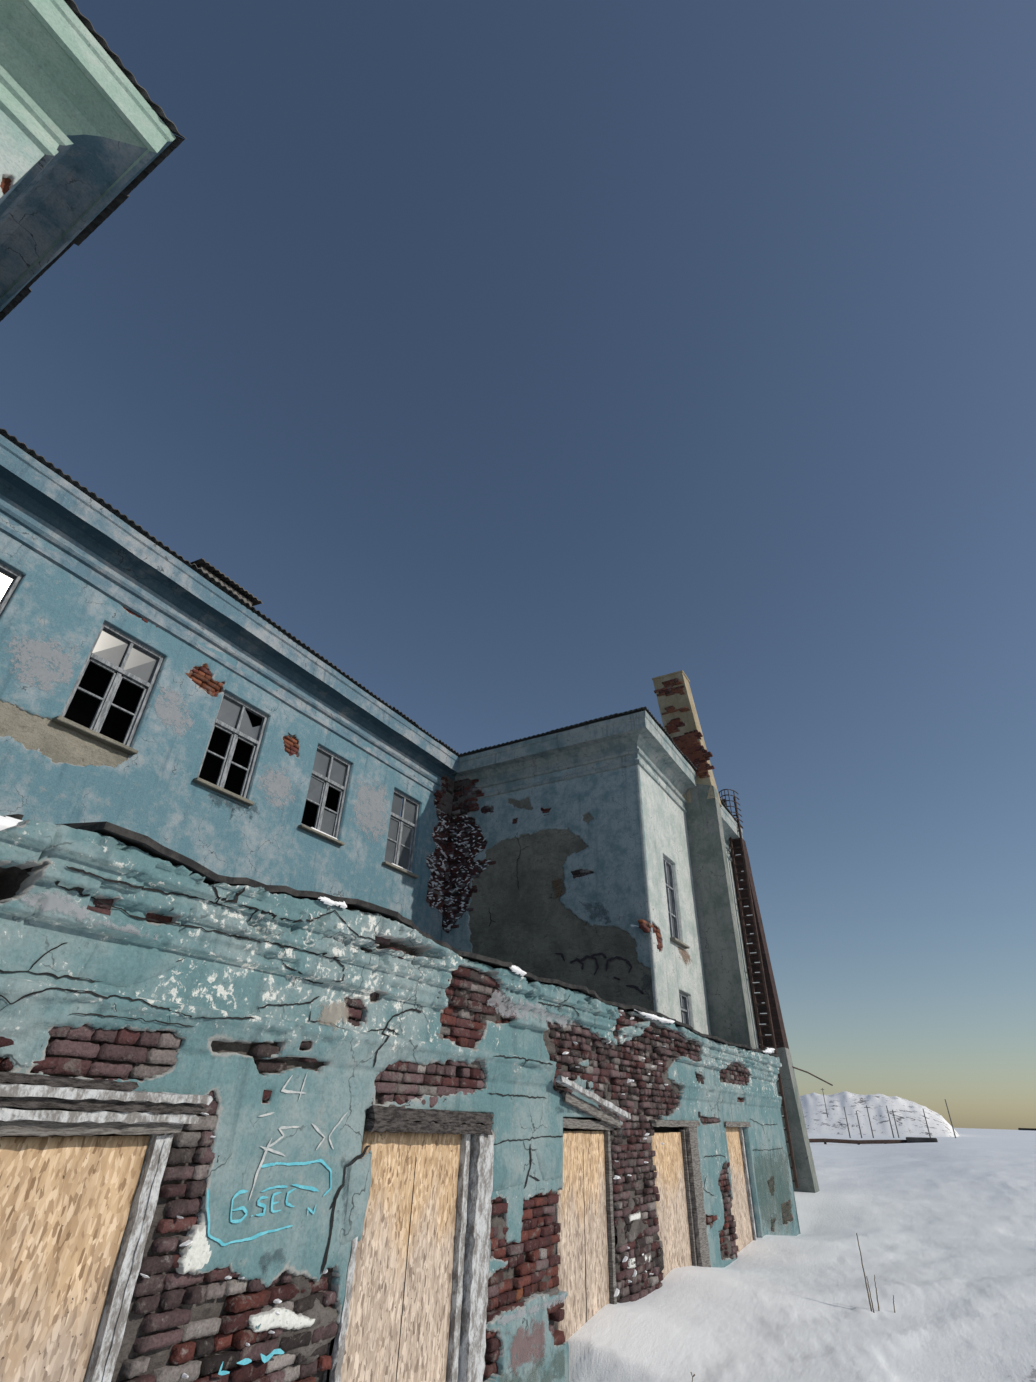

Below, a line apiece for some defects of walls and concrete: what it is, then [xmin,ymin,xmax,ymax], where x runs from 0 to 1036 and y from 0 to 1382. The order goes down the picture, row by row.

flaking render [185,664,224,697]
flaking render [0,700,128,768]
flaking render [654,678,715,778]
peeling [0,866,172,940]
crack [0,866,421,1068]
flaking render [360,936,418,959]
flaking render [0,1036,14,1072]
flaking render [30,1024,182,1091]
spalling [211,1041,325,1103]
flaking render [372,775,750,1303]
flaking render [111,1091,338,1382]
flaking render [483,1189,565,1381]